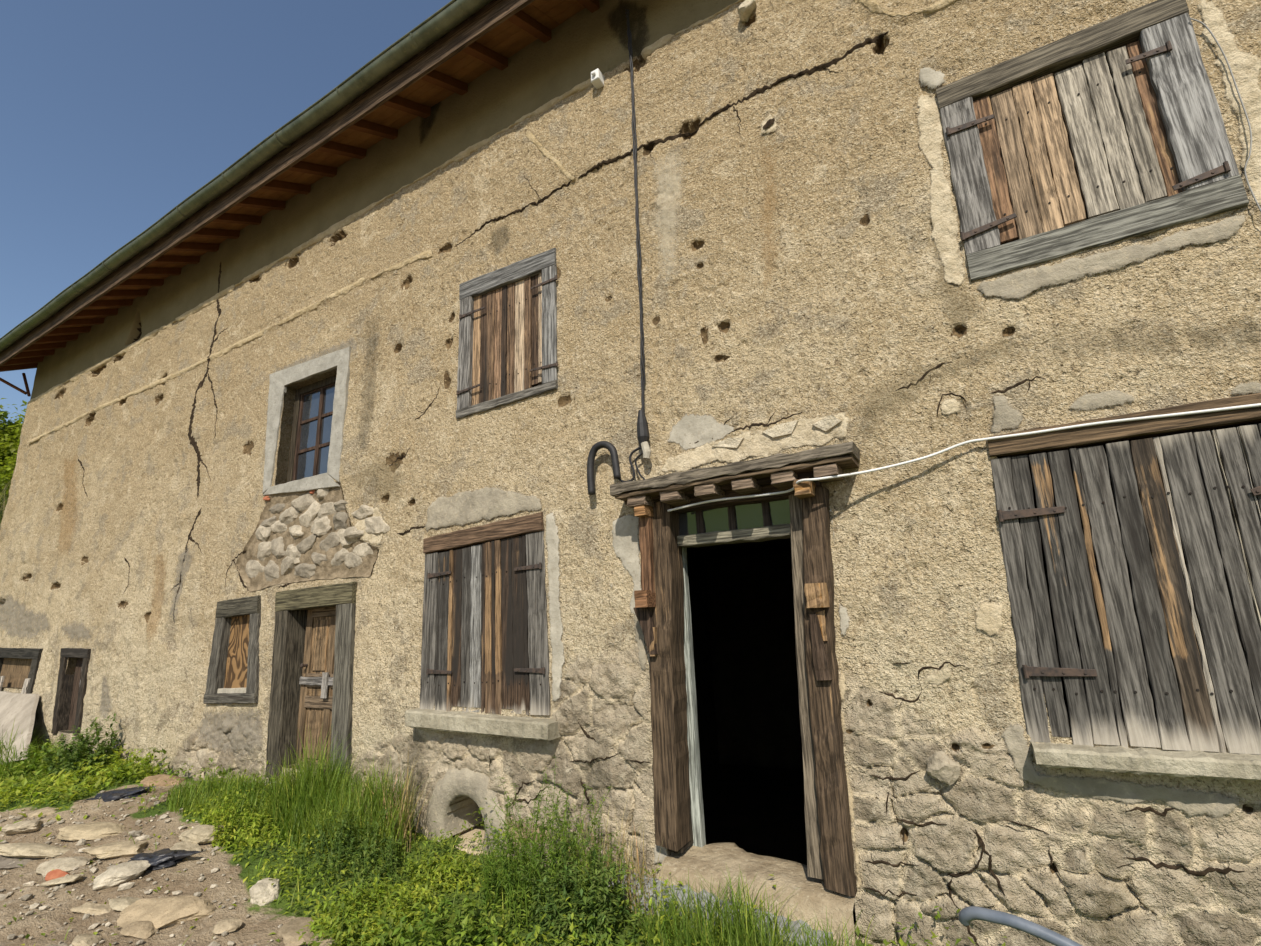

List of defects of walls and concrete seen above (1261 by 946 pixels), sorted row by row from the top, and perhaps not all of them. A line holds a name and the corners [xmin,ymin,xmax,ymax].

crack [456,31,889,246]
crack [170,262,249,624]
spalling [235,482,390,592]